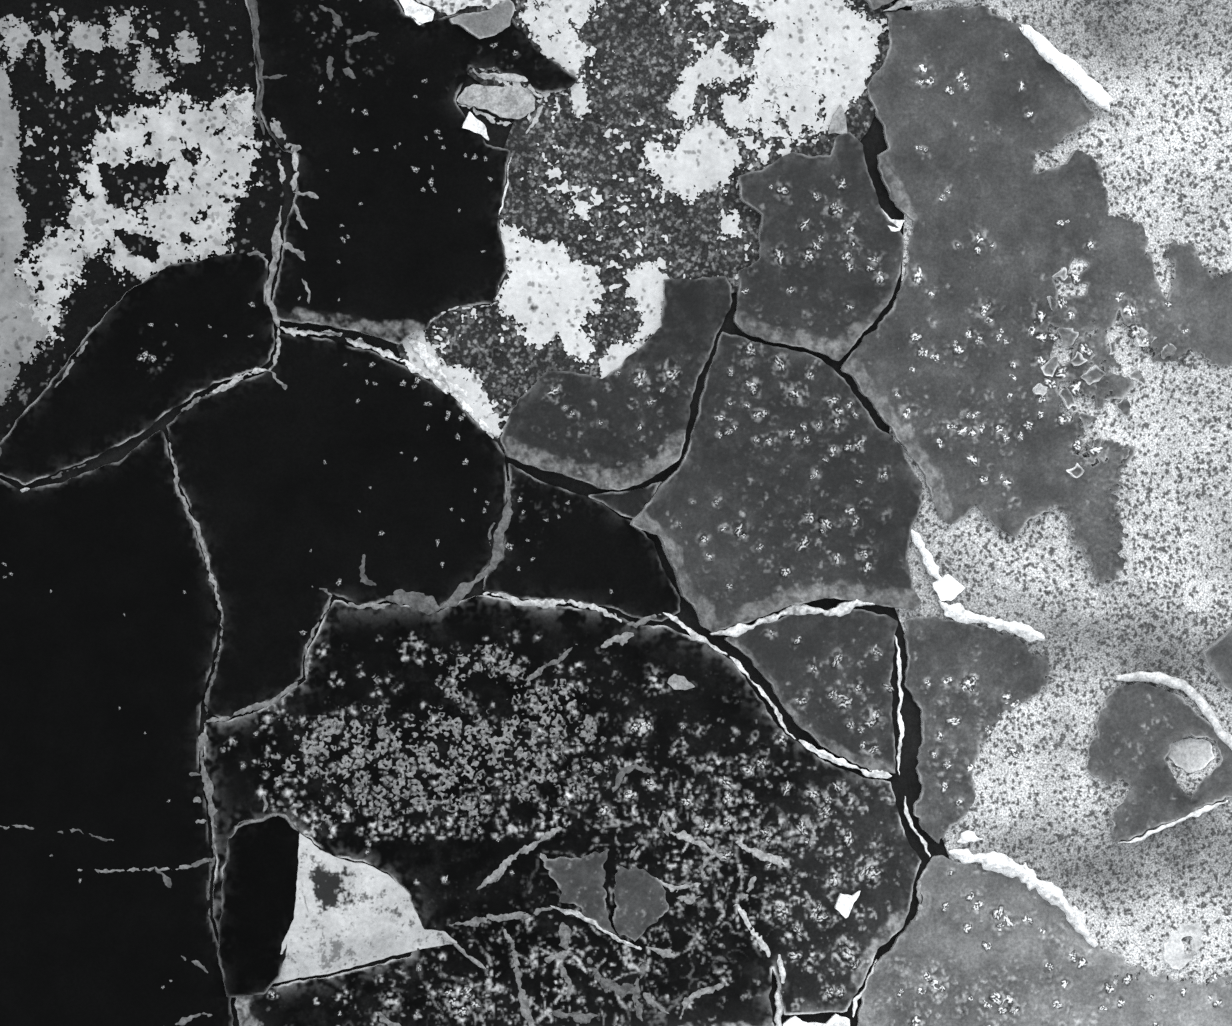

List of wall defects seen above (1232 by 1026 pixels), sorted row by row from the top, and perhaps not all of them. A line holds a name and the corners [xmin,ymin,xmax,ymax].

crack [181,0,499,435]
crack [499,157,511,215]
crack [55,341,88,387]
spalling [0,0,905,718]
spalling [483,0,1232,1026]
peeling [0,430,921,1026]
crack [0,442,931,921]
crack [175,1012,212,1026]
crack [181,956,208,973]
crack [449,824,726,1026]
crack [630,811,788,957]
crack [852,959,877,1017]